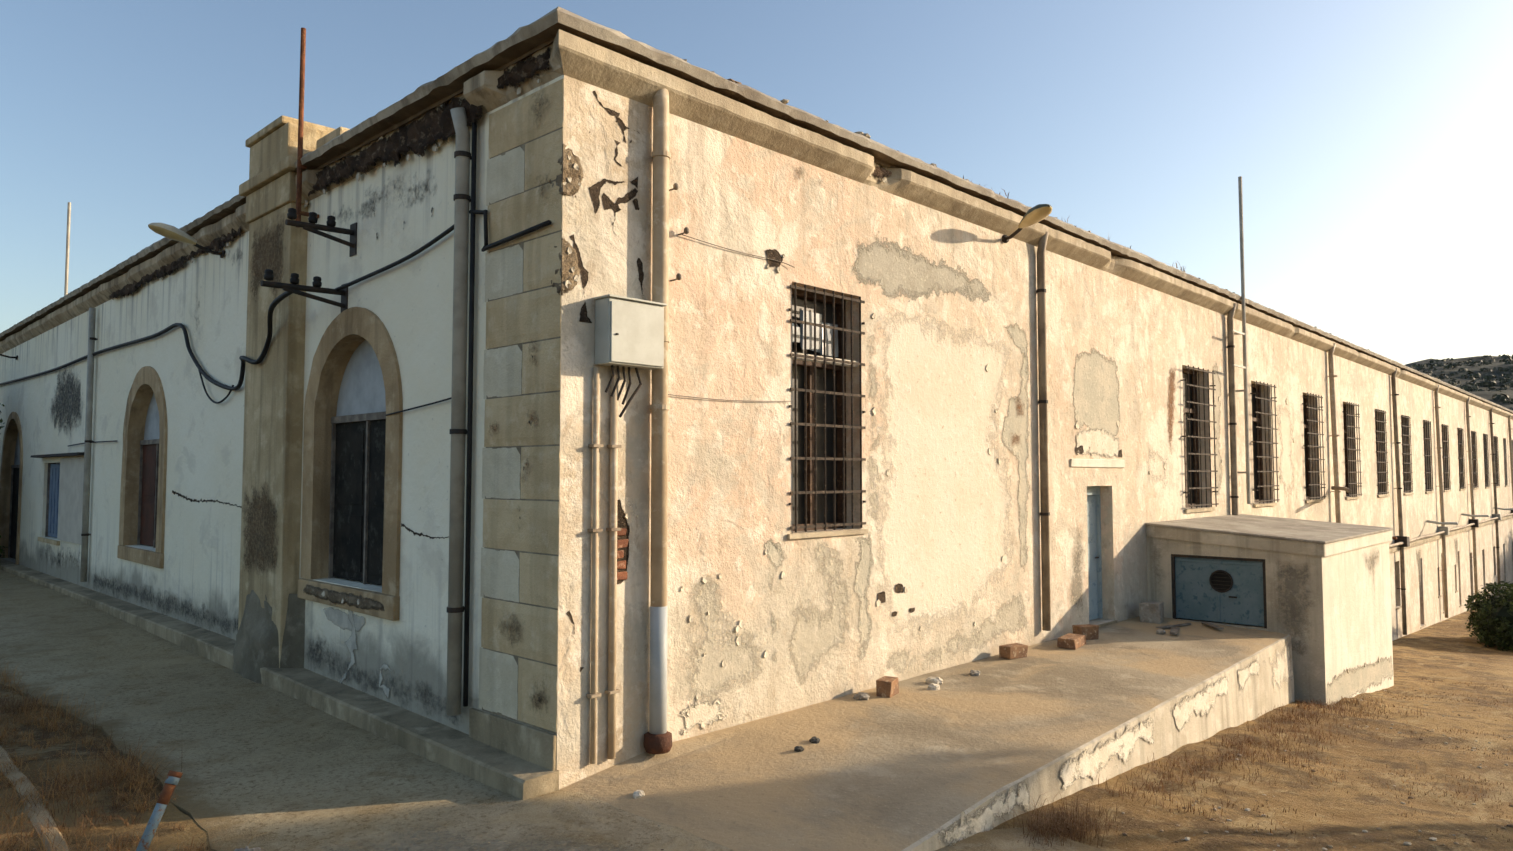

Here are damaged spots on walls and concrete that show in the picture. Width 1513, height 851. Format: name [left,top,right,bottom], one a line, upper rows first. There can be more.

spalling [541,144,583,198]
water stain [251,218,284,295]
spalling [551,238,580,296]
water stain [50,369,83,431]
flaking render [1073,348,1122,458]
crack [172,490,242,508]
water stain [242,487,277,571]
crack [401,523,449,539]
peeling [679,231,1030,735]
water stain [94,576,238,632]
peeling [938,782,1031,846]